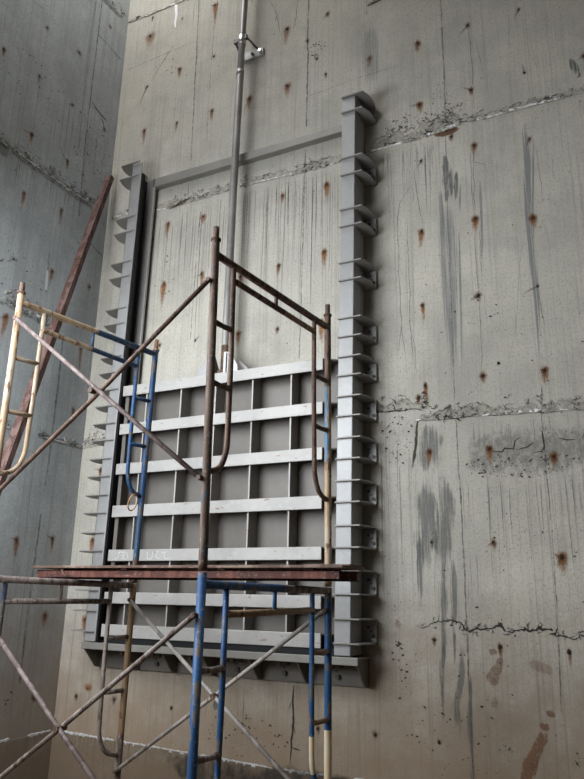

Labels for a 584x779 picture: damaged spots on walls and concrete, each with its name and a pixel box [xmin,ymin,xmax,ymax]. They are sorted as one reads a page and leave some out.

leakage [416,149,460,205]
leakage [523,137,539,335]
crack [492,412,584,453]
leakage [417,487,452,588]
leakage [441,572,457,650]
crack [421,615,584,640]
leakage [197,763,324,779]